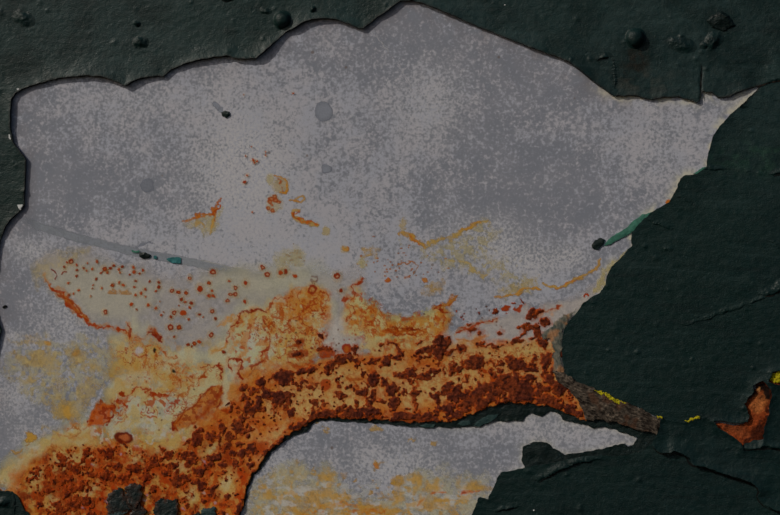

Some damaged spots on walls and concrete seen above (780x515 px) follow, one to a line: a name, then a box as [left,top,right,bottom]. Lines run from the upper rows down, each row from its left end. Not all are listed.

peeling [141,290,233,346]
rust [0,220,623,515]
peeling [241,411,637,515]
peeling [106,483,178,515]
peeling [194,506,216,515]